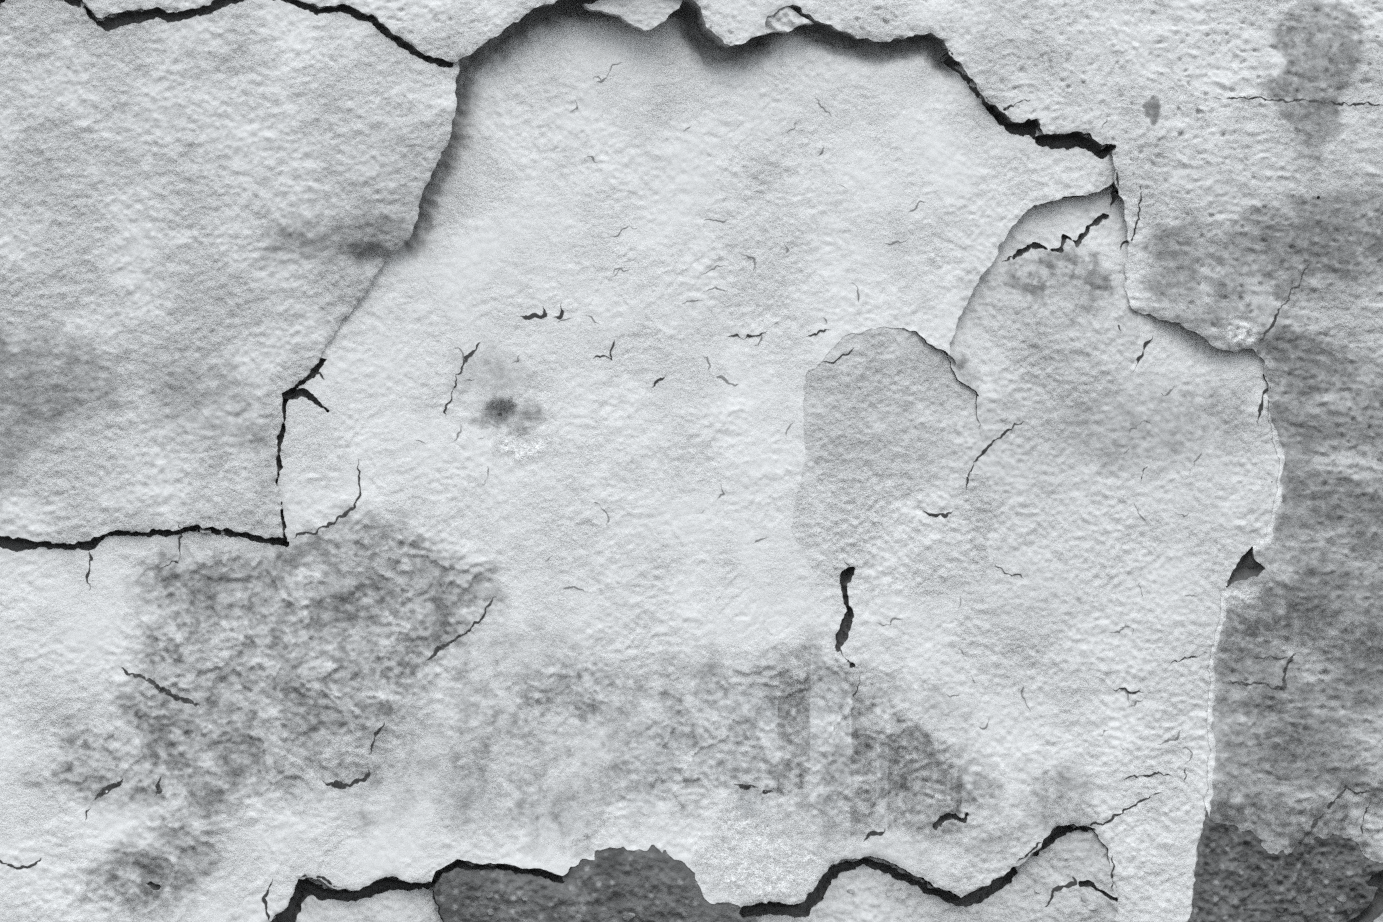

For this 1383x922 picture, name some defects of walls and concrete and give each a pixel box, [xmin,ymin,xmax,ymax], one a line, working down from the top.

crack [59,0,454,67]
crack [941,49,1142,261]
crack [520,302,615,360]
crack [0,358,361,591]
spalling [278,0,1383,922]
leakage [148,538,489,739]
crack [835,561,900,699]
leakage [107,855,195,903]
leakage [130,677,260,819]
crack [262,860,565,922]
leakage [696,793,825,902]
leakage [888,740,961,827]